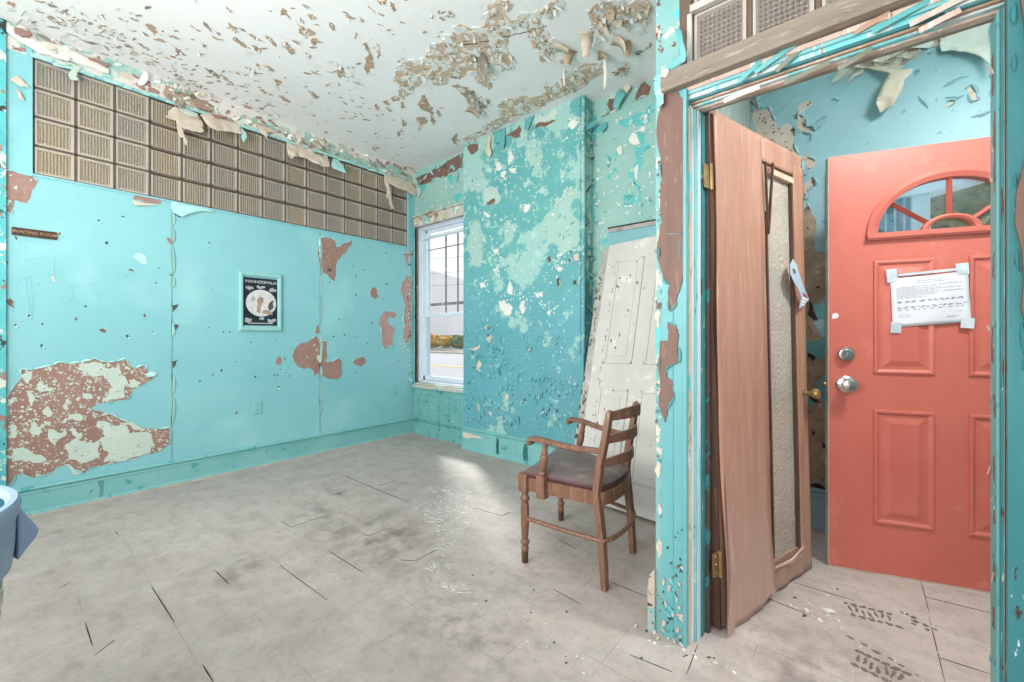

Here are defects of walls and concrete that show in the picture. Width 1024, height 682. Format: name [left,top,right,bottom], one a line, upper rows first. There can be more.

peeling [947,53,994,108]
peeling [5,0,688,486]
flaking render [724,0,964,493]
peeling [987,321,995,364]
peeling [987,455,996,524]
peeling [655,529,683,642]